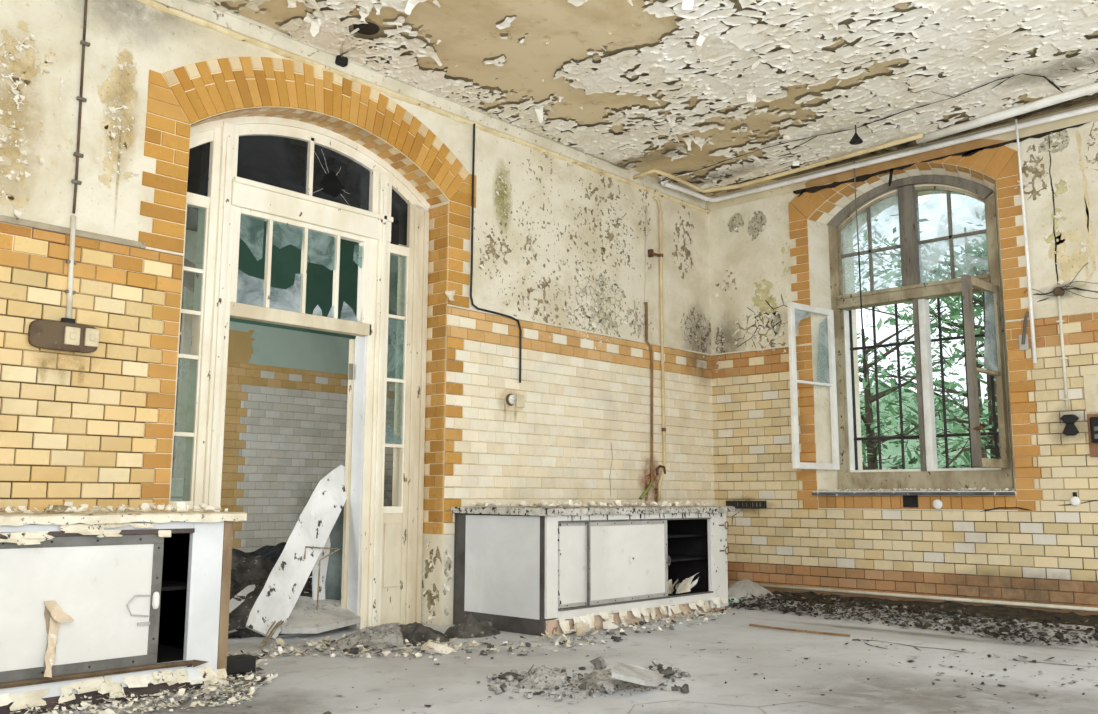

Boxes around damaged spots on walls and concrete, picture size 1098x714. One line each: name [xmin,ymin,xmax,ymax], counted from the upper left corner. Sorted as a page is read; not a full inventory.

peeling [94,47,140,188]
leakage [497,182,508,216]
peeling [197,0,1098,350]
corrosion [643,464,657,503]